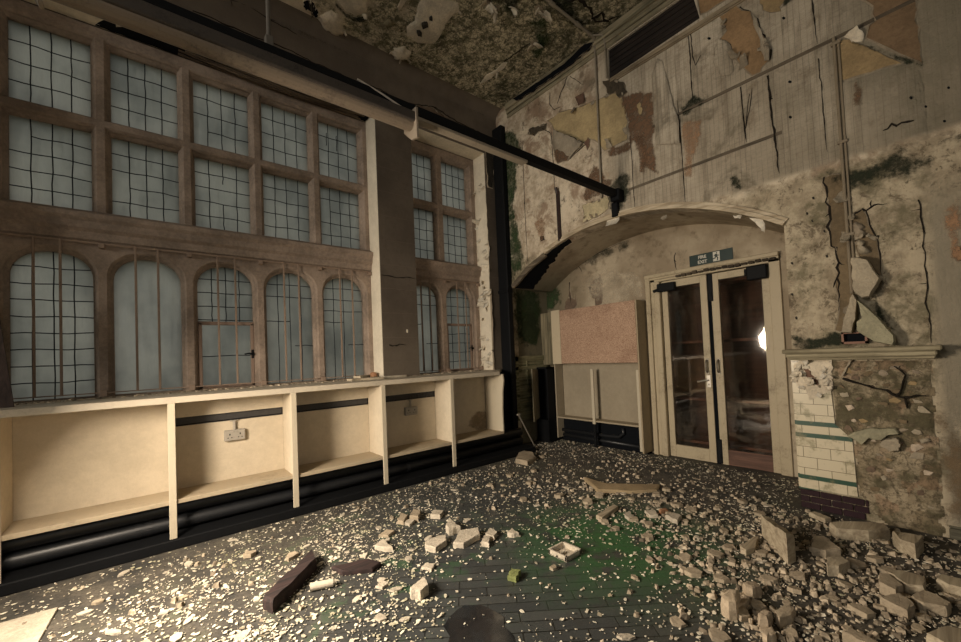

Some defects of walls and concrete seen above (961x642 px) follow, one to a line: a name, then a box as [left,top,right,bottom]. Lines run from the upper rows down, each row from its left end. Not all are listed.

peeling [480,0,498,24]
damp [529,18,549,58]
peeling [535,7,553,25]
damp [541,0,590,27]
damp [827,148,930,189]
peeling [472,205,495,370]
damp [506,160,524,274]
crack [822,177,887,310]
crack [913,200,931,339]
damp [513,288,561,345]
crack [842,366,926,409]
spalling [789,360,946,537]